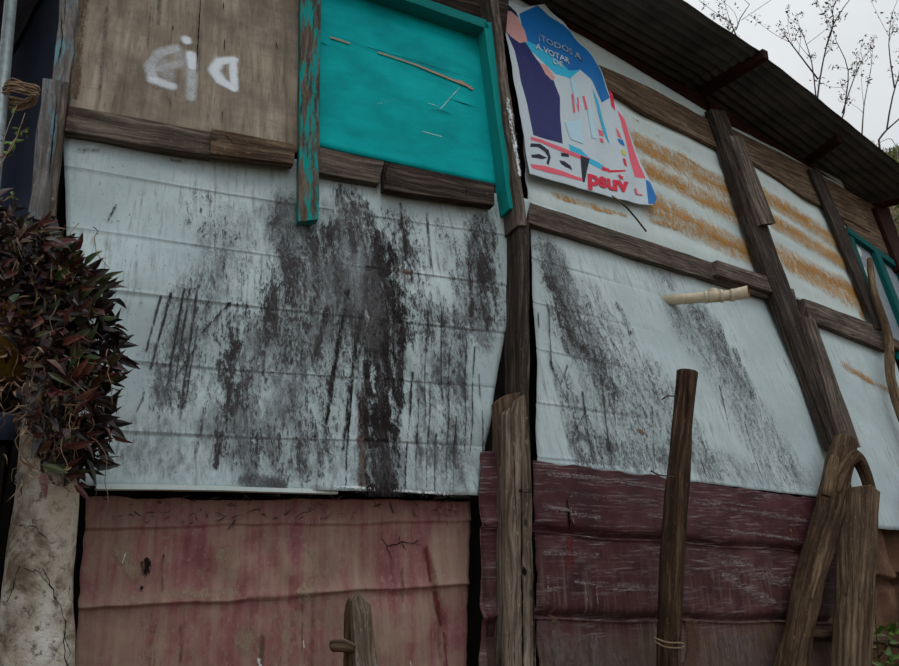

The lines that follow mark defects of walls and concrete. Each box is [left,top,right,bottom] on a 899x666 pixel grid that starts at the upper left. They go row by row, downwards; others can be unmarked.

water stain [137,183,505,497]
water stain [532,237,674,469]
corrosion [628,120,754,266]
water stain [671,304,803,481]
corrosion [761,185,866,321]